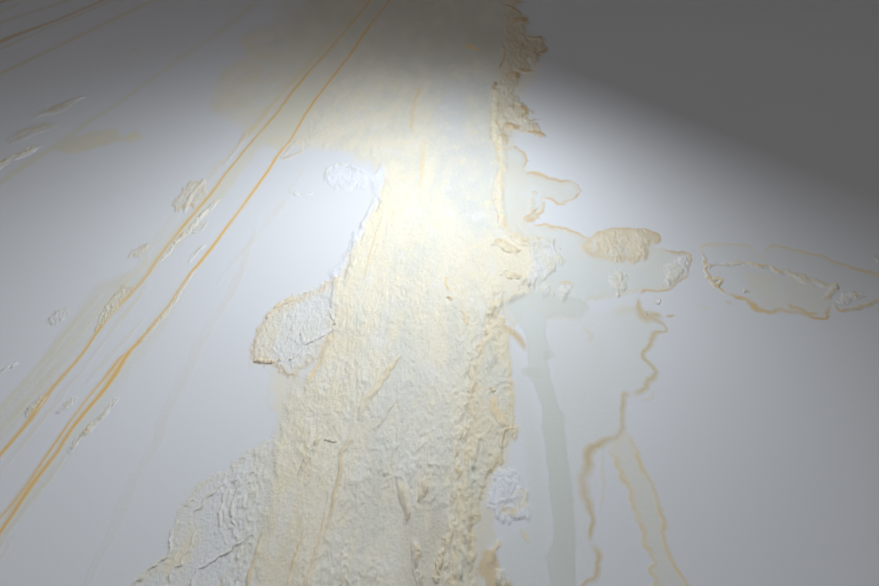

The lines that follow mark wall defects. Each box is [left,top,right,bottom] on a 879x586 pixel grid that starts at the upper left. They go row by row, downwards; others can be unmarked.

corrosion [0,0,391,562]
damp [206,0,879,586]